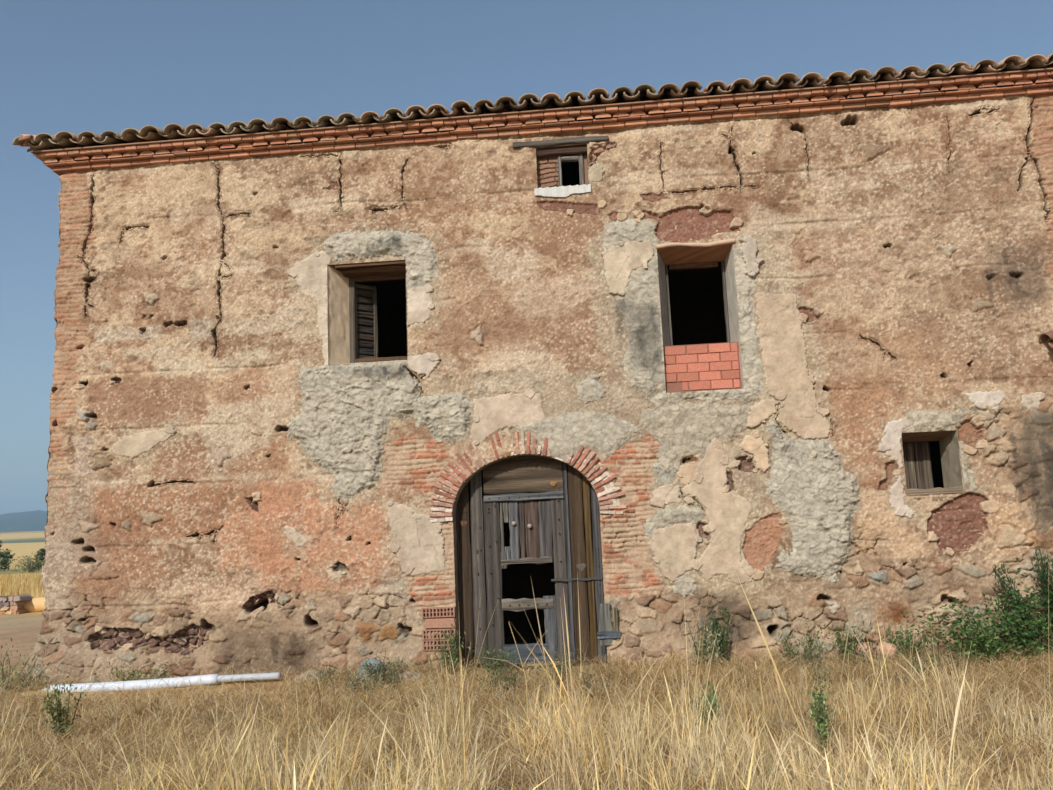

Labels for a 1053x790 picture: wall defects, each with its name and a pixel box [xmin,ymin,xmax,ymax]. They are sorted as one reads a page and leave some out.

crack [658,126,761,199]
crack [945,105,1002,177]
crack [1016,94,1051,222]
crack [76,172,100,319]
crack [118,224,150,245]
crack [209,160,252,358]
spalling [534,189,765,296]
peeling [644,292,831,585]
peeling [877,418,915,519]
spalling [927,470,1000,557]
spalling [88,624,212,656]
spalling [242,590,279,619]